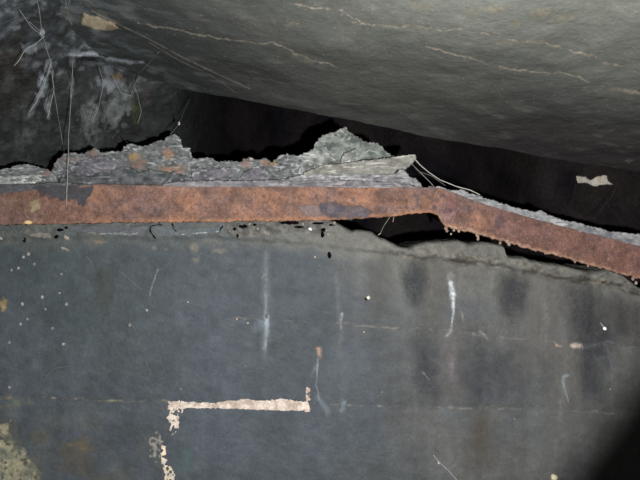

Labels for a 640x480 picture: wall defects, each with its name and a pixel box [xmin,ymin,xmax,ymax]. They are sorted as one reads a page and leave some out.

corrosion [0,127,640,246]
spalling [576,175,611,186]
peeling [167,387,311,435]
peeling [149,436,175,480]